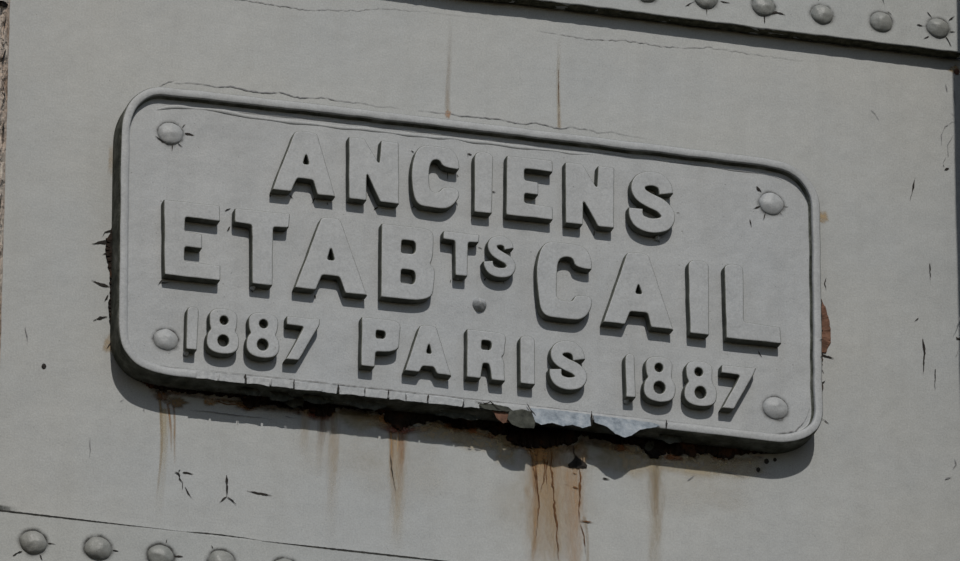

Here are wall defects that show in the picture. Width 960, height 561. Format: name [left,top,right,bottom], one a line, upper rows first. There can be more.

peeling [0,0,10,352]
corrosion [155,391,188,445]
peeling [140,371,777,472]
corrosion [529,447,559,559]
corrosion [609,443,751,501]